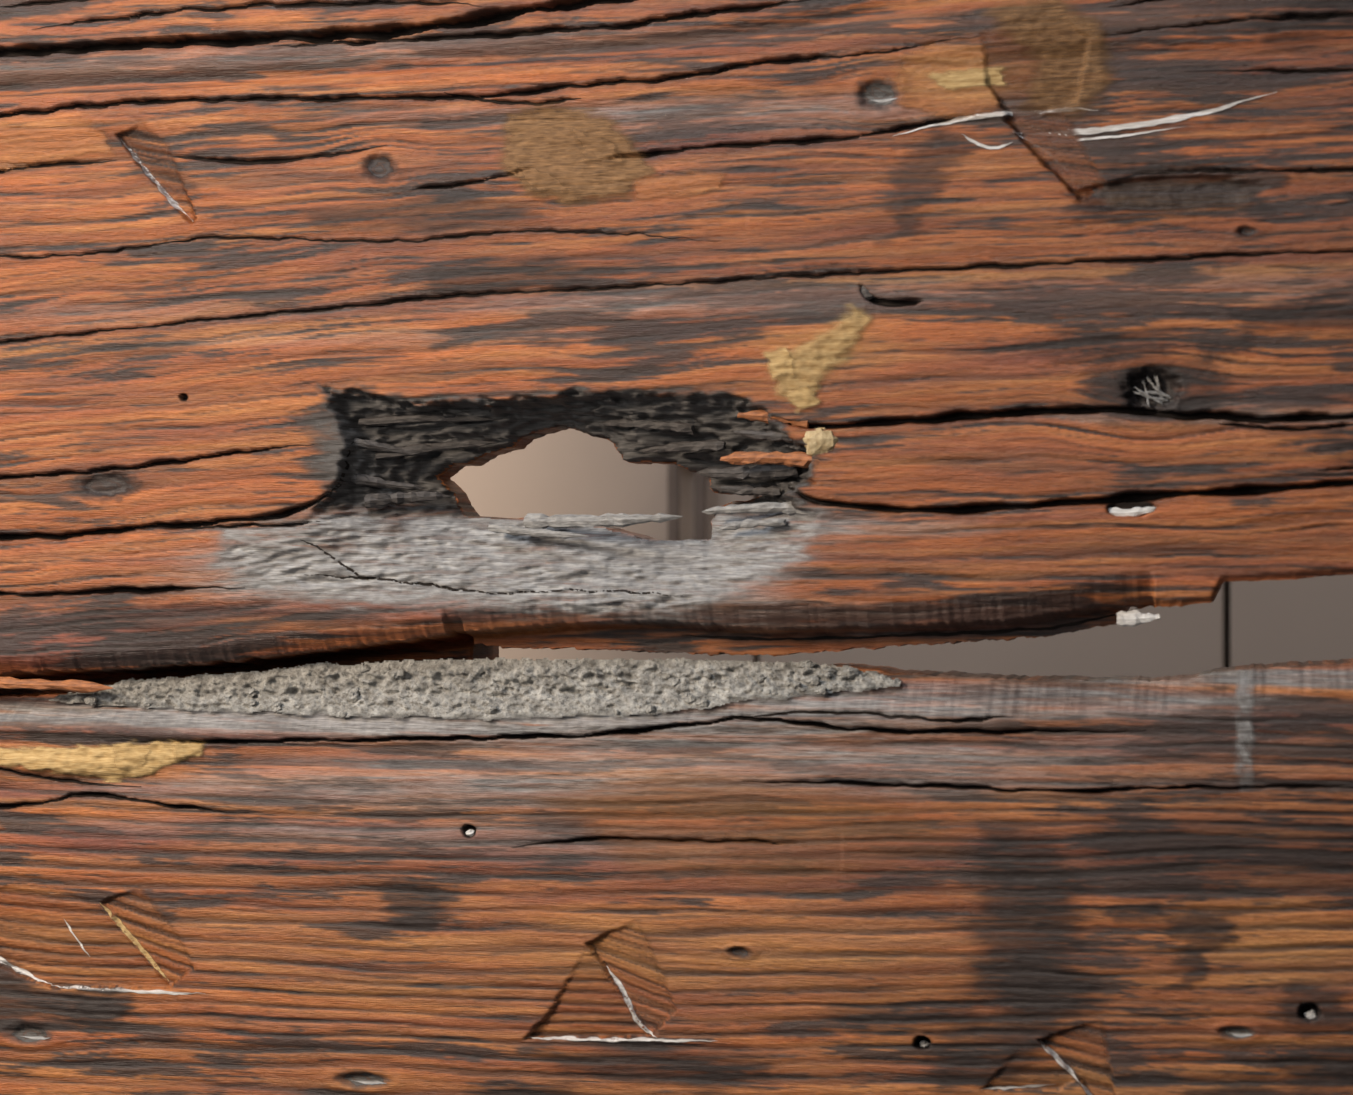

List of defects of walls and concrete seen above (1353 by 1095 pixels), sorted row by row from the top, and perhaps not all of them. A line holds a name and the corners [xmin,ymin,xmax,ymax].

crack [0,0,807,57]
crack [1102,0,1353,36]
crack [0,35,980,118]
crack [1185,67,1353,75]
spalling [304,385,820,516]
crack [768,407,1353,431]
crack [788,467,1353,514]
spalling [0,882,204,995]
spalling [527,923,711,1042]
spalling [982,1023,1112,1095]